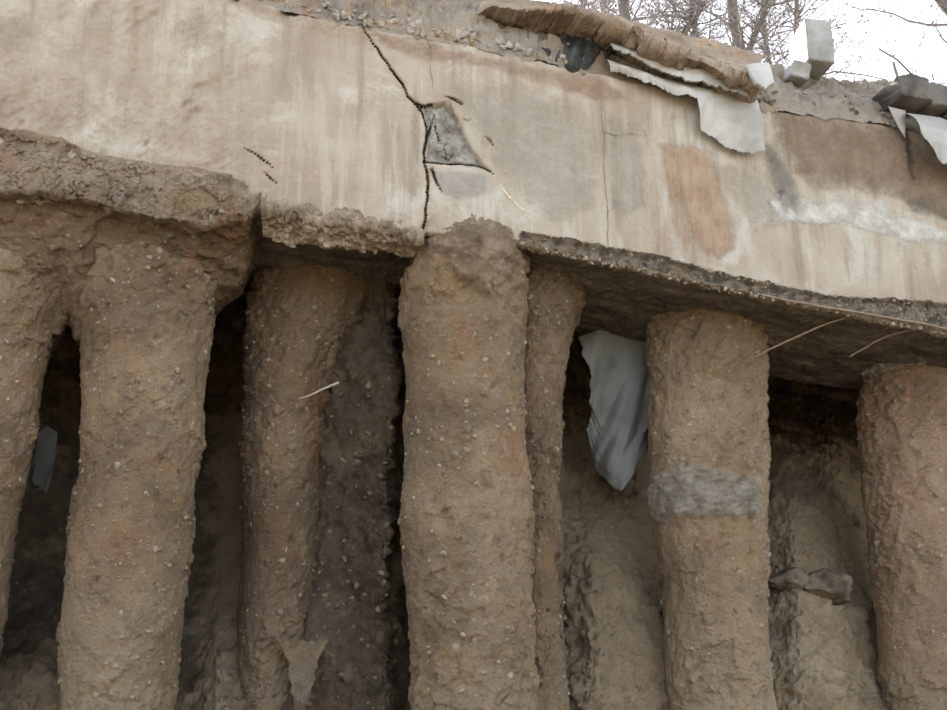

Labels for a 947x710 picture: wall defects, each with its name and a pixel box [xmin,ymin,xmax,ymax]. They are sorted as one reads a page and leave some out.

crack [361,23,532,229]
spalling [425,105,479,167]
damp [905,128,914,179]
spalling [261,192,947,358]